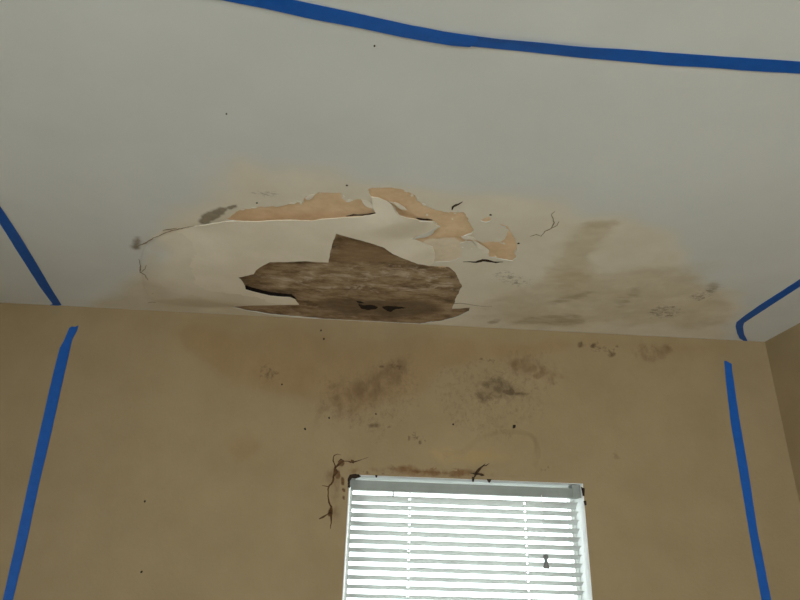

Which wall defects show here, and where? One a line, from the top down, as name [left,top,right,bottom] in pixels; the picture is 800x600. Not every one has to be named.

crack [136,225,199,280]
peeling [228,185,520,268]
spalling [245,285,296,299]
spalling [357,301,404,312]
leakage [58,126,783,539]
crack [319,454,368,529]